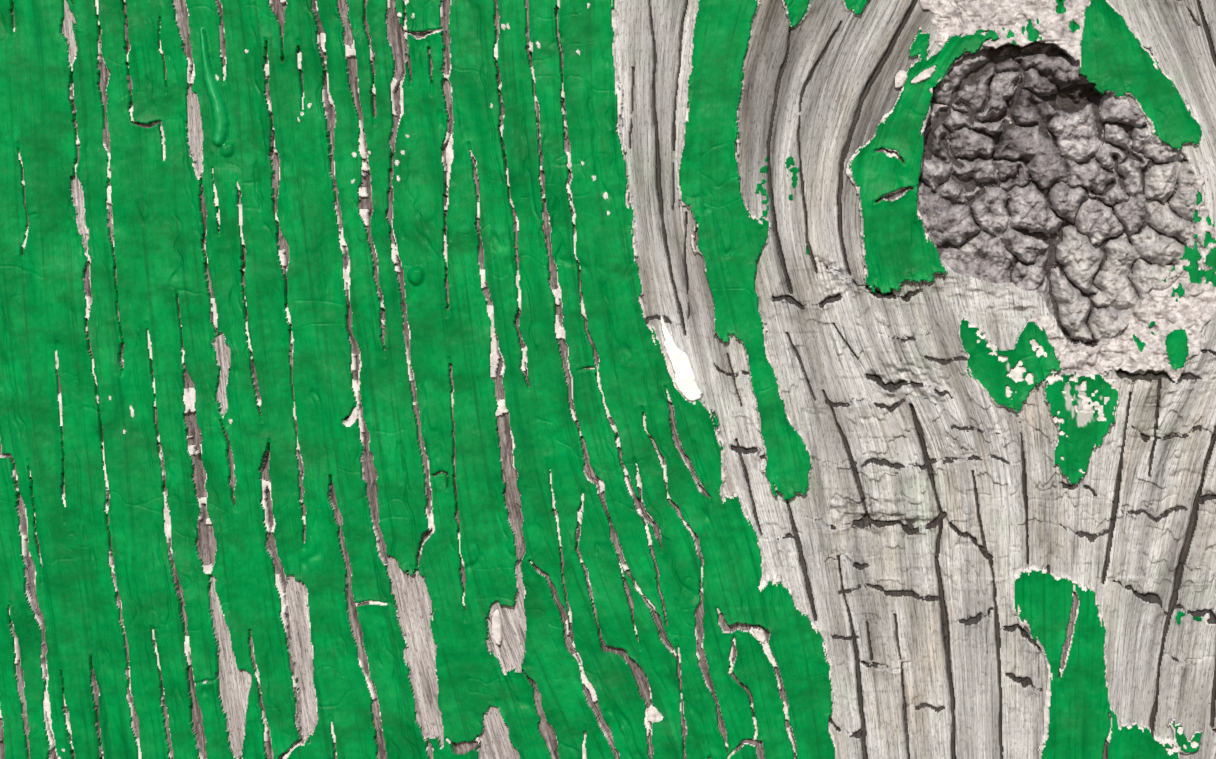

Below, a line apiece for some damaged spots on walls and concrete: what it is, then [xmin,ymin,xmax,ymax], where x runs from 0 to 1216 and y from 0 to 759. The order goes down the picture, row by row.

crack [0,0,797,759]
peeling [611,0,1216,759]
crack [731,0,1216,759]